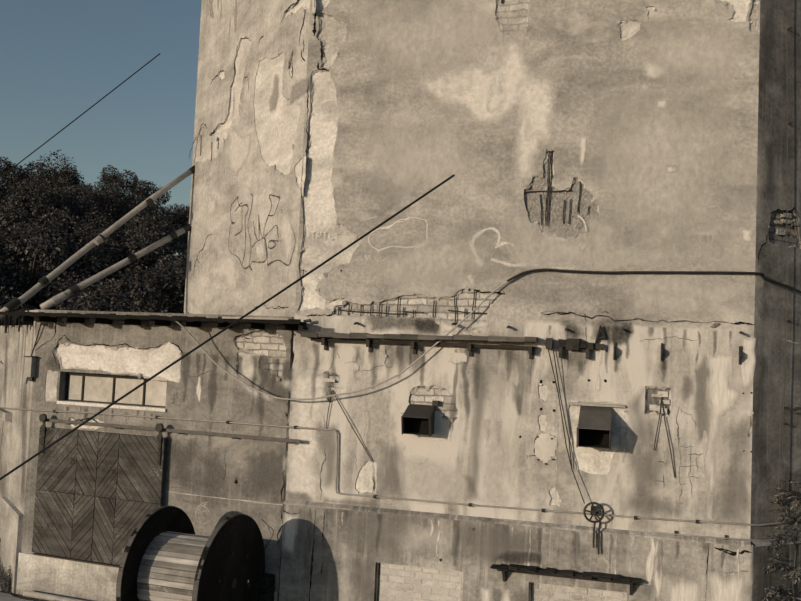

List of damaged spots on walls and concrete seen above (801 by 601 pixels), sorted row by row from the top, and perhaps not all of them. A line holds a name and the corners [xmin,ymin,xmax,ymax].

crack [189,36,264,156]
peeling [254,0,504,335]
spalling [524,149,600,239]
water stain [183,354,227,408]
flaking render [234,331,287,382]
water stain [247,356,349,501]
peeling [355,461,377,494]
flaking render [409,385,459,431]
water stain [475,368,503,500]
crack [659,407,703,503]
water stain [340,544,351,601]
water stain [405,520,447,557]